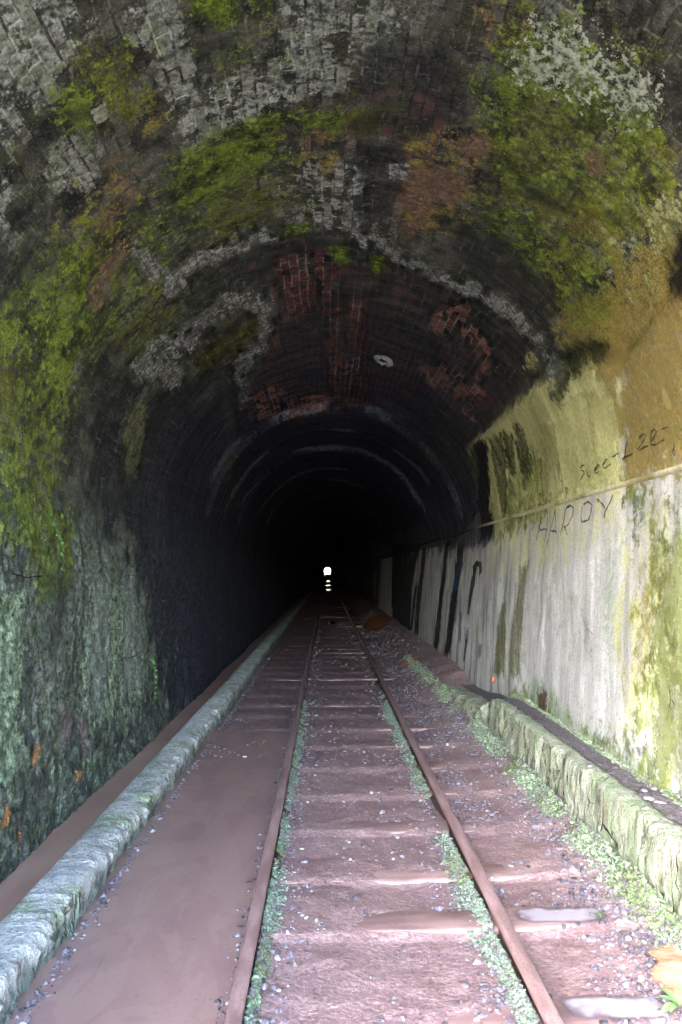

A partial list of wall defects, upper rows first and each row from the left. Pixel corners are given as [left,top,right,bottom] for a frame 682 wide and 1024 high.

damp [128,236,171,294]
damp [129,282,274,410]
spalling [166,213,610,422]
damp [474,392,617,544]